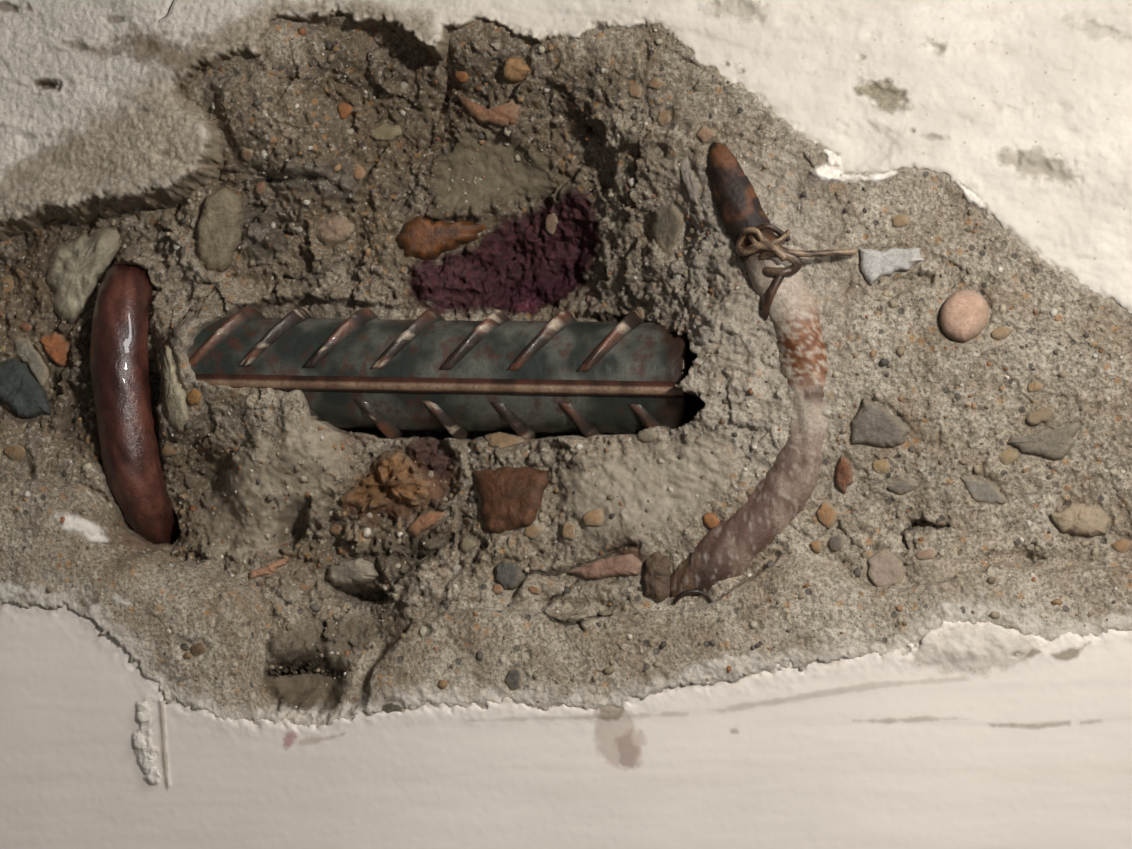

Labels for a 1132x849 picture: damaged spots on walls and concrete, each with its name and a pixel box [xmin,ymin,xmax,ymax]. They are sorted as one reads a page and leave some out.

peeling [192,1,292,64]
peeling [0,81,209,215]
spalling [545,213,558,235]
spalling [437,307,497,321]
spalling [582,508,604,527]
spalling [14,592,60,610]
spalling [690,665,774,686]